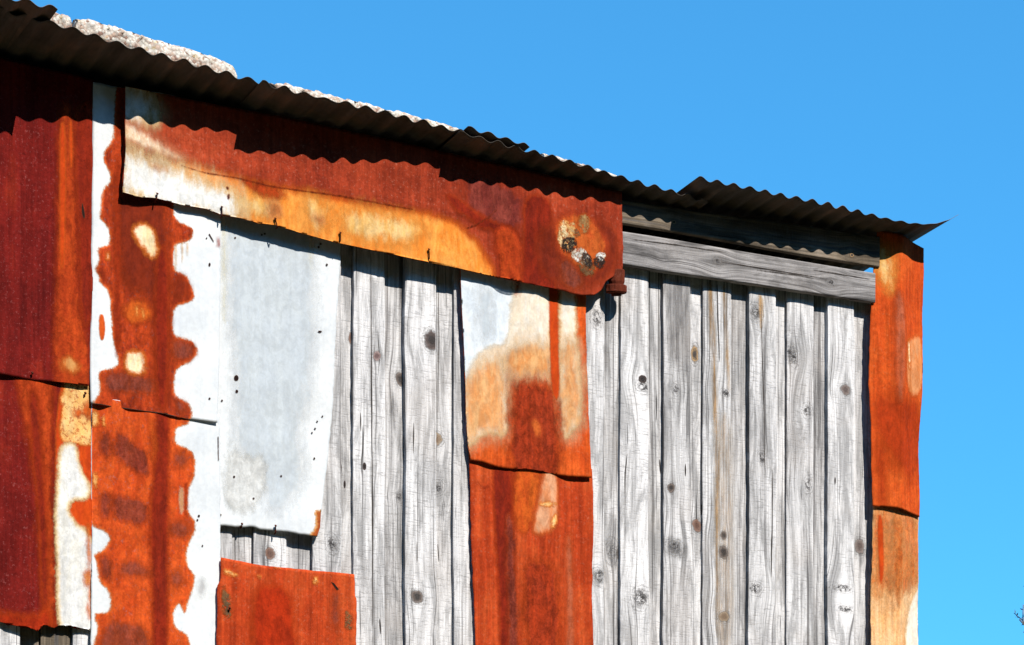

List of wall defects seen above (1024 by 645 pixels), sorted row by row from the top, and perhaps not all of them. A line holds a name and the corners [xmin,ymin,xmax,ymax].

rust [0,87,198,645]
rust [171,160,617,645]
rust [871,291,920,604]